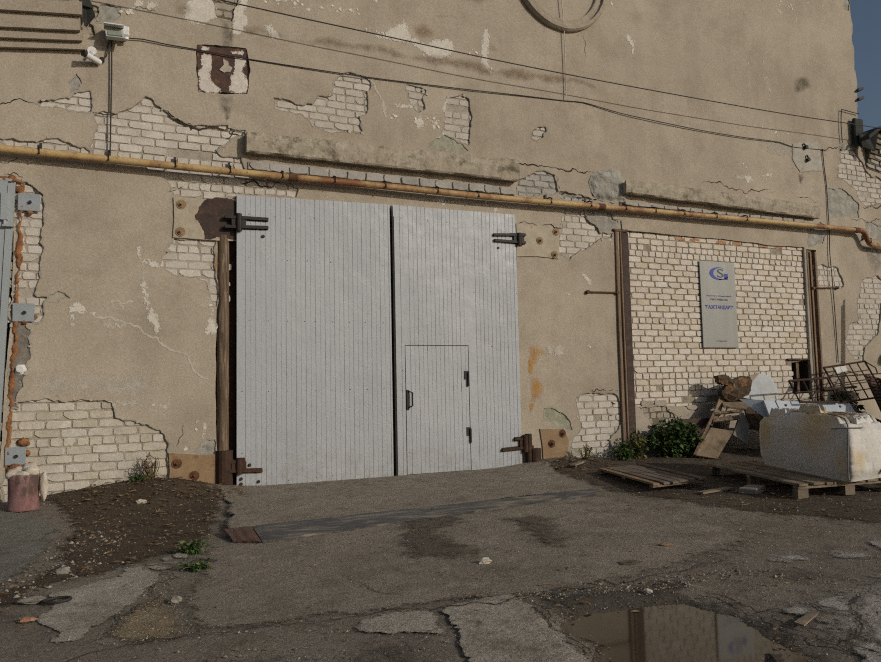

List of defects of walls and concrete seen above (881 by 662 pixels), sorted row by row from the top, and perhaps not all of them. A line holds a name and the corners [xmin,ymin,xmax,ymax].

peeling [182,0,248,35]
spalling [0,73,299,199]
peeling [198,46,248,94]
spalling [274,71,373,135]
spalling [390,83,473,154]
corrosion [195,197,236,240]
spalling [480,169,624,260]
spalling [0,177,171,496]
spalling [137,238,230,335]
spalling [845,275,881,361]
spalling [543,391,622,458]
spalling [0,465,10,502]